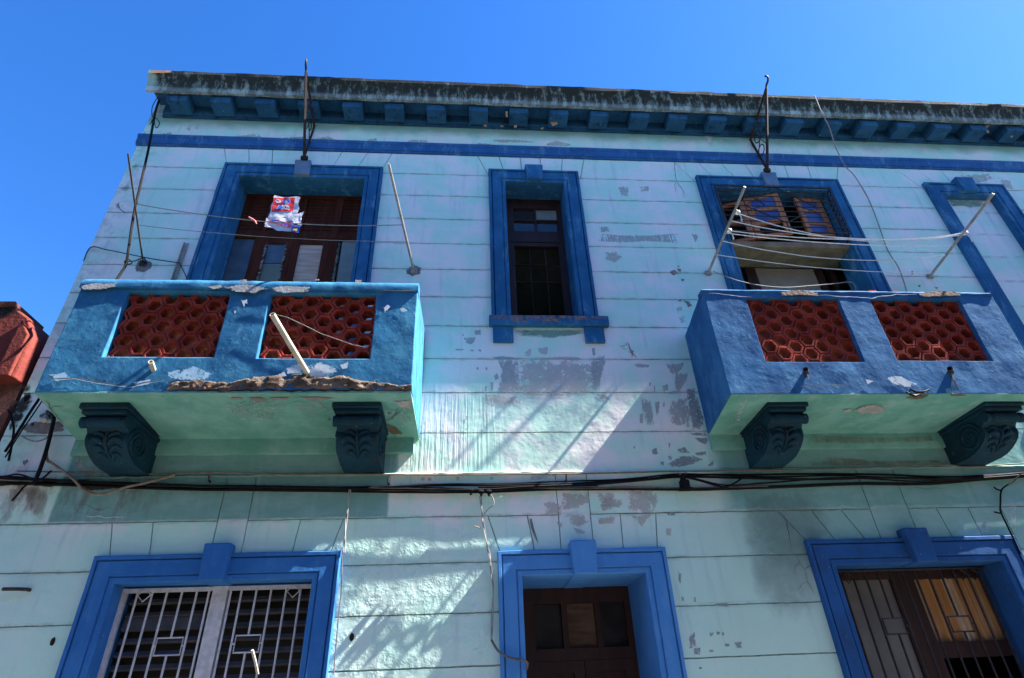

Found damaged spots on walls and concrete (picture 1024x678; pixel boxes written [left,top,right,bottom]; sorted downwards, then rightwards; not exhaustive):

peeling [601,226,676,262]
spalling [167,362,412,409]
peeling [477,348,609,424]
peeling [640,363,714,467]
peeling [544,490,657,533]